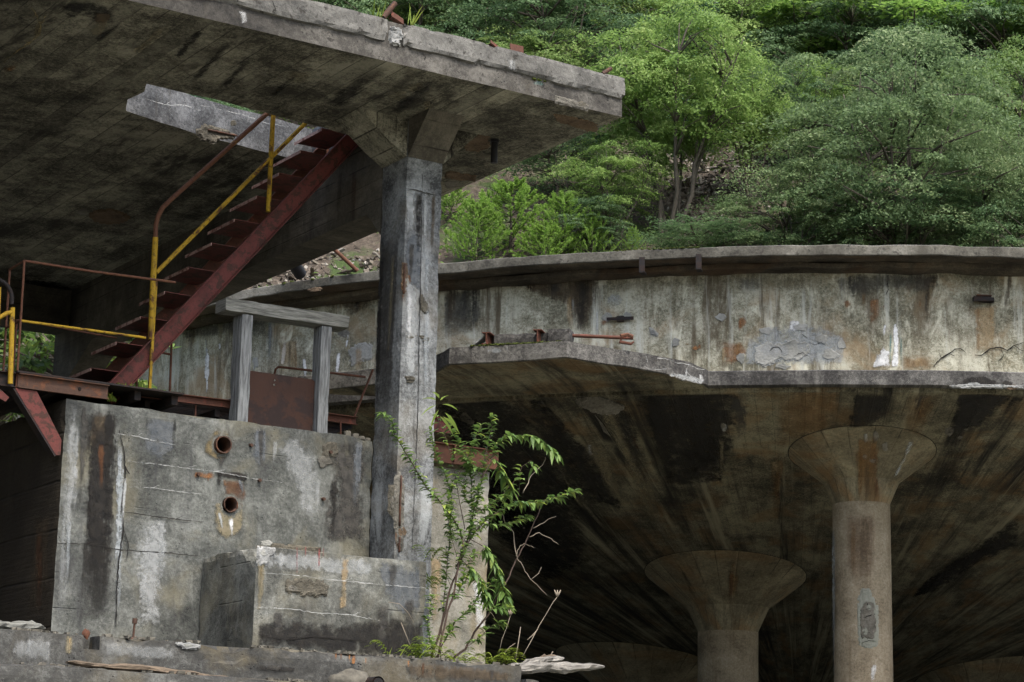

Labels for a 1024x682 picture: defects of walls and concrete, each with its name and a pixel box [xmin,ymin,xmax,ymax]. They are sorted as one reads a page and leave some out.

water stain [330,76,374,105]
spalling [196,120,238,144]
flaking render [736,324,846,370]
efflorescence [874,324,902,367]
crack [934,343,1023,366]
water stain [80,410,127,587]
crack [116,430,130,619]
spalling [860,601,876,639]